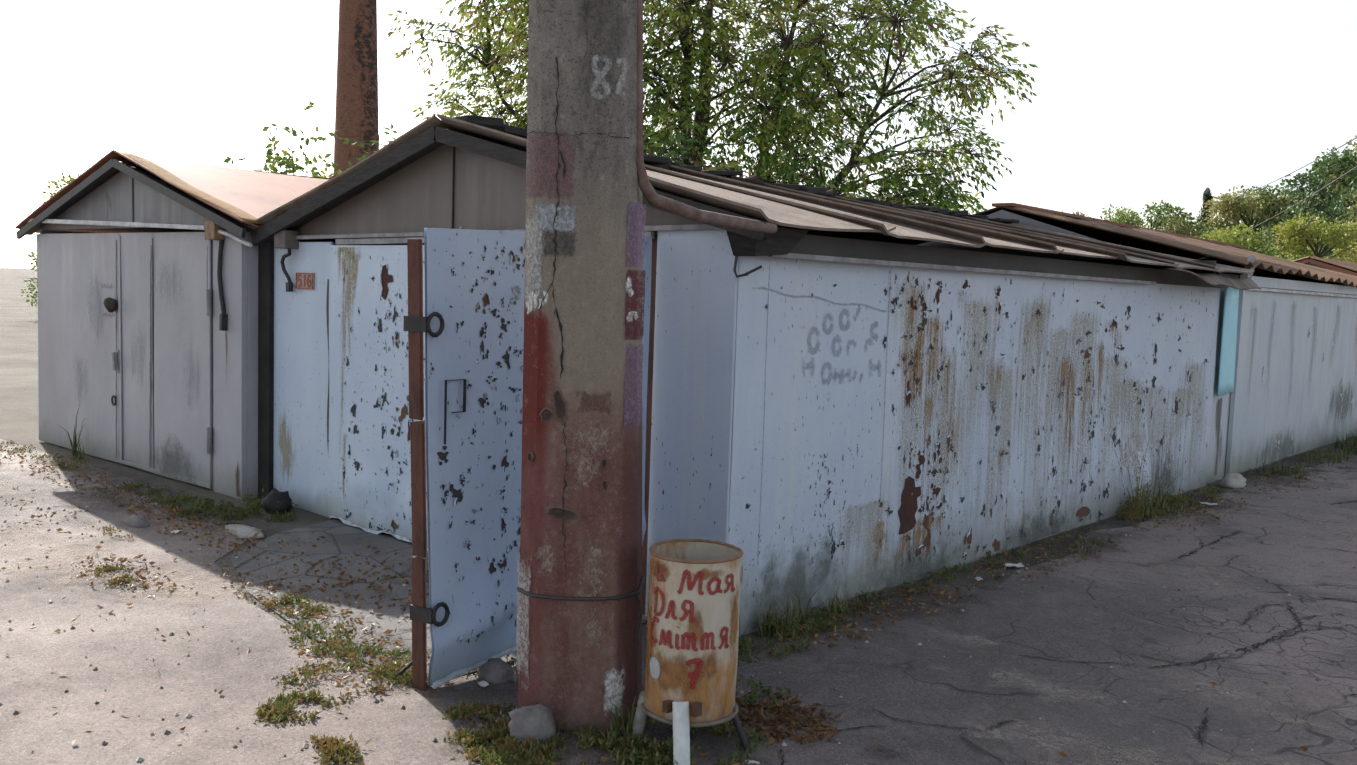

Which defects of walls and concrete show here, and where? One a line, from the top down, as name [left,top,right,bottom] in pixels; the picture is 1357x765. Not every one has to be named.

crack [525,57,629,379]
peeling [339,256,413,490]
peeling [368,501,412,533]
peeling [426,238,534,643]
peeling [539,386,608,490]
corrosion [904,291,950,436]